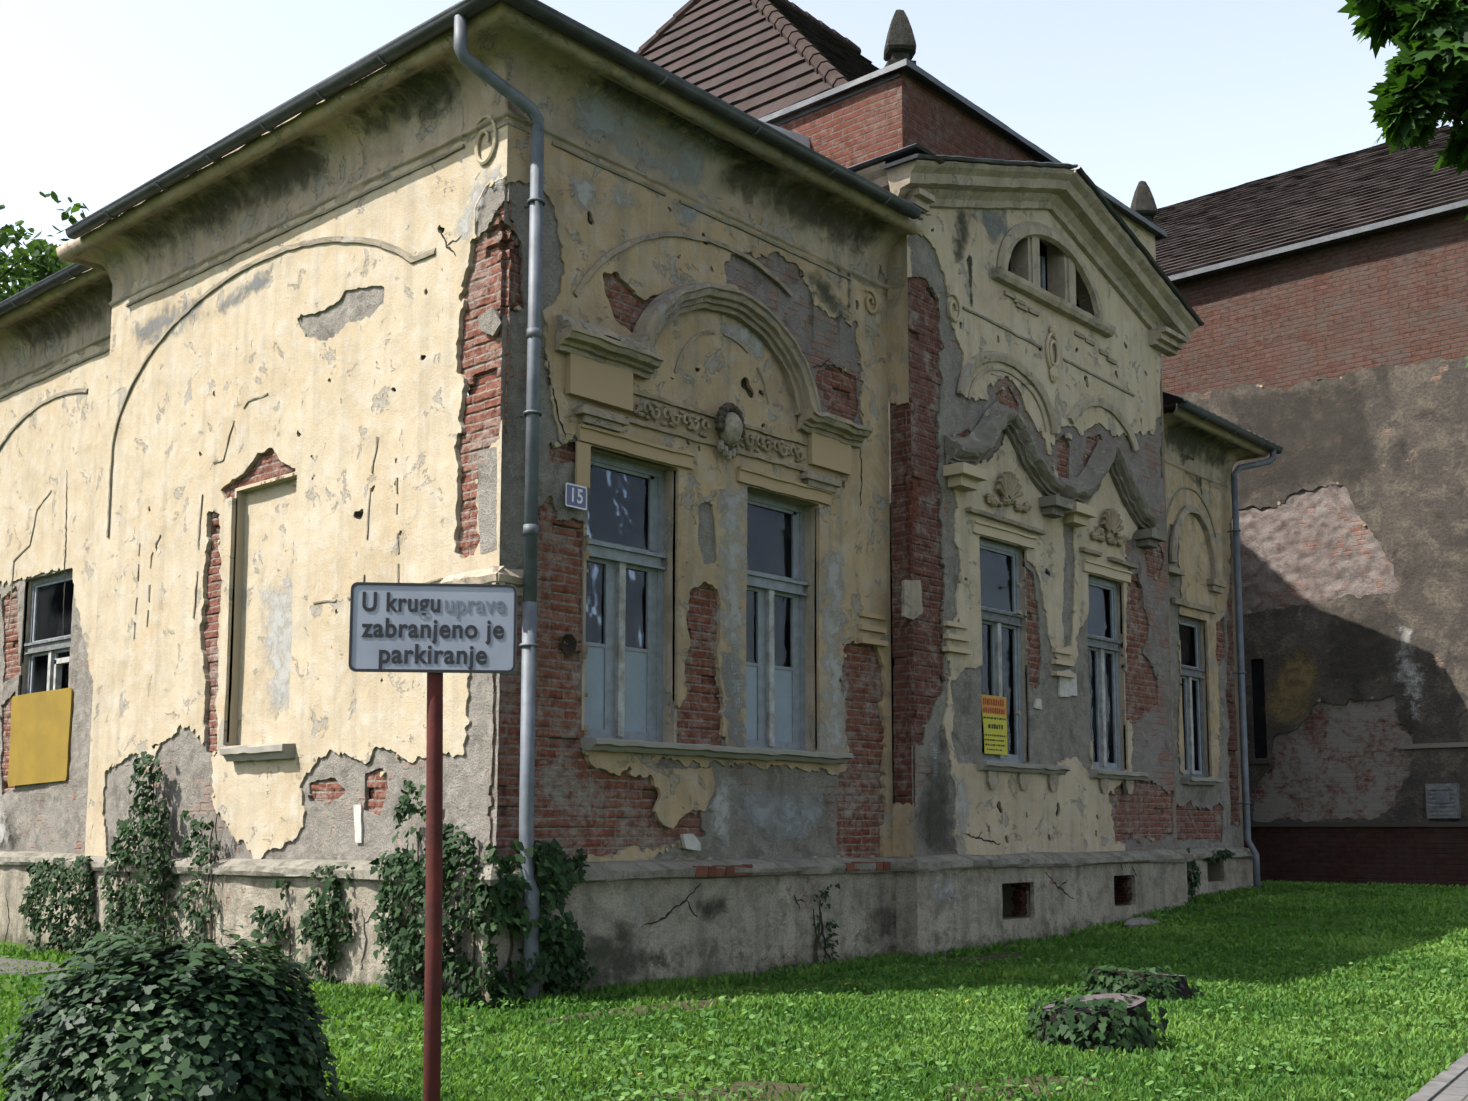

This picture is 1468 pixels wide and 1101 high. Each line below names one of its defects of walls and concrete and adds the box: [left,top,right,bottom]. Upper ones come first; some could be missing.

flaking render [1161,209,1468,394]
flaking render [0,169,1421,877]
crack [642,884,701,927]